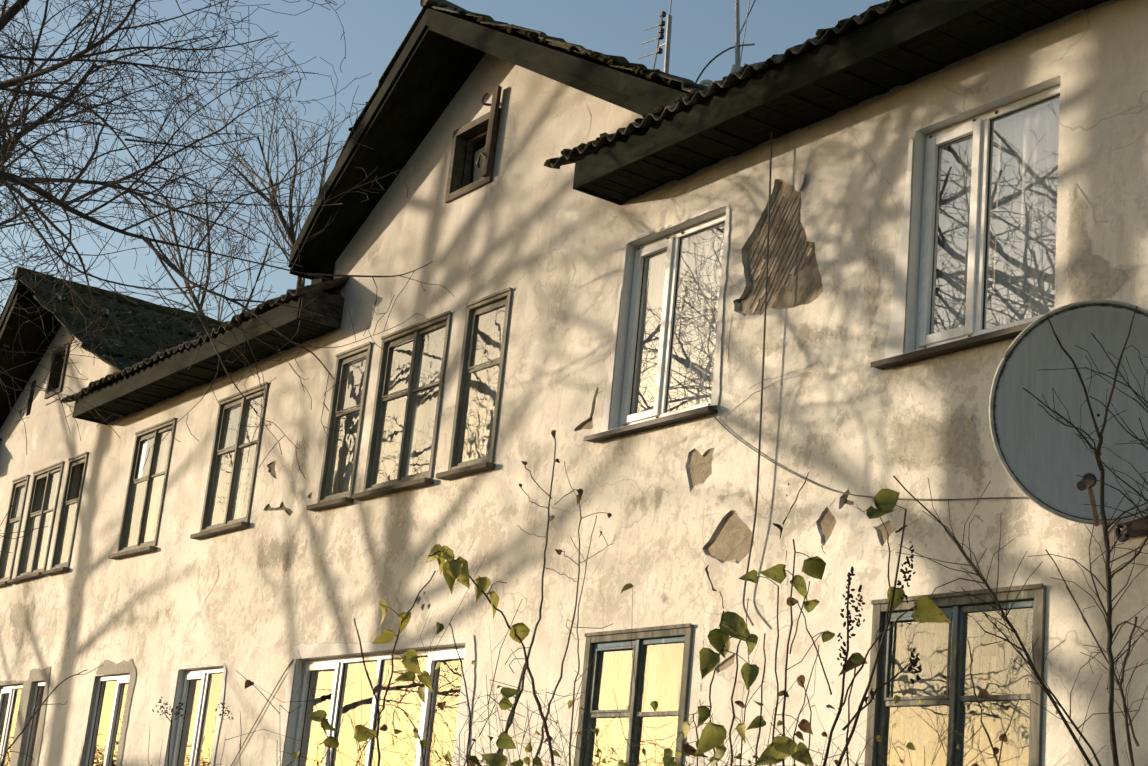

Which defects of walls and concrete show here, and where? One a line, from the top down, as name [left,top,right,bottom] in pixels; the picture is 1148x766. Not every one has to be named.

spalling [733,165,823,316]
spalling [685,448,714,492]
spalling [702,510,754,564]
spalling [816,489,854,554]
spalling [874,520,917,546]